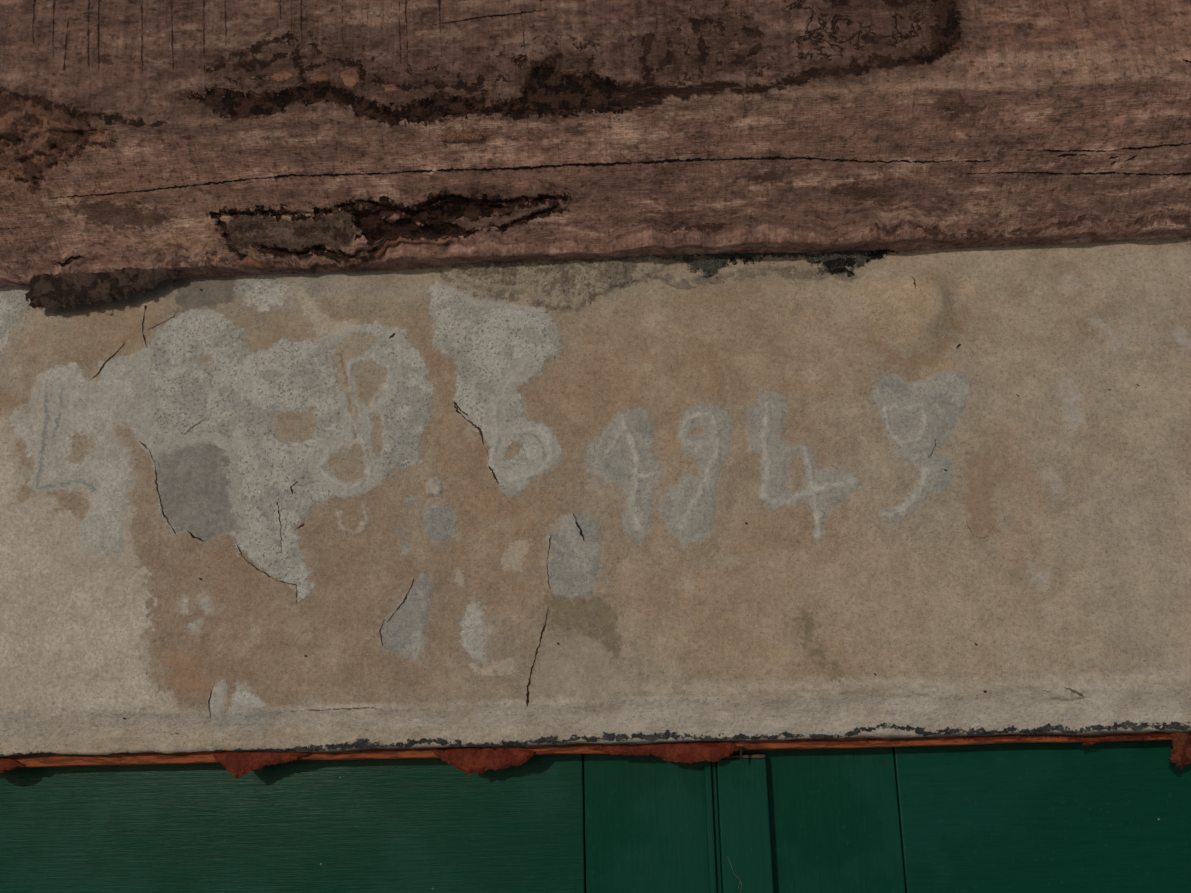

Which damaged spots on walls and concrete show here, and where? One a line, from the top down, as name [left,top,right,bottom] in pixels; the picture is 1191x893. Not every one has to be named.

peeling [268,61,402,97]
crack [50,143,1191,199]
peeling [0,286,38,374]
peeling [88,303,446,628]
peeling [172,610,211,644]
crack [526,607,549,706]